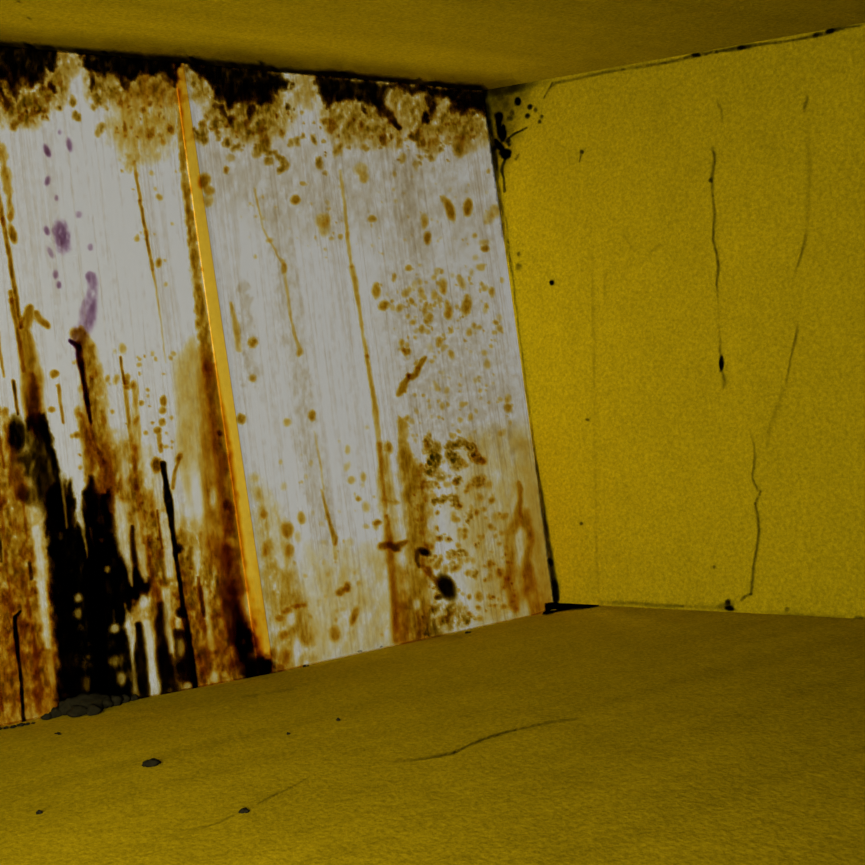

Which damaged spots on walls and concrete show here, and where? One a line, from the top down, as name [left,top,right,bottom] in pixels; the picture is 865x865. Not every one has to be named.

water stain [0,42,543,230]
water stain [134,161,155,281]
crack [707,151,719,296]
corrosion [71,327,115,513]
water stain [0,198,200,713]
corrosion [323,497,337,545]
corrosion [364,342,378,424]
water stain [372,284,414,310]
corrosion [396,356,427,396]
water stain [458,481,541,620]
crack [717,356,725,371]
crack [744,437,761,597]